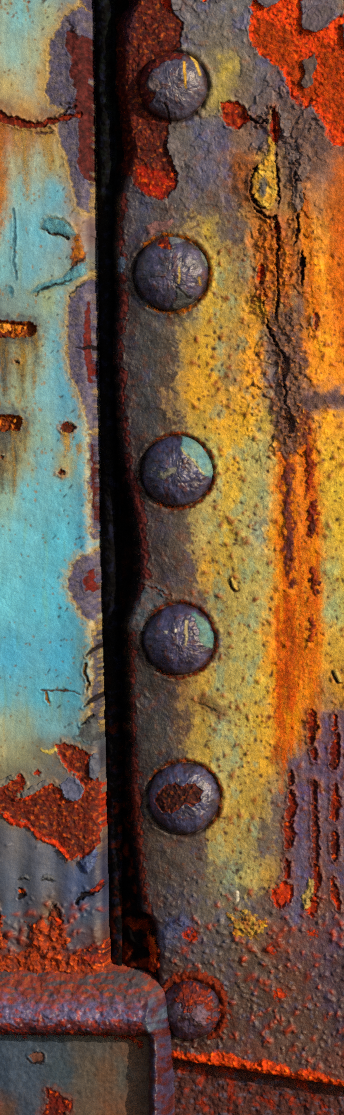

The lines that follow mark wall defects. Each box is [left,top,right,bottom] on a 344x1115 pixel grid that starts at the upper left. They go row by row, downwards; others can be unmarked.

peeling [45,0,97,214]
peeling [115,0,185,200]
peeling [220,101,250,129]
crack [247,107,274,124]
peeling [249,0,344,146]
crack [254,207,306,351]
corrosion [116,192,217,604]
peeling [0,277,108,862]
corrosion [271,390,344,770]
corrosion [128,632,224,916]
corrosion [0,909,112,975]
corrosion [160,969,344,1087]